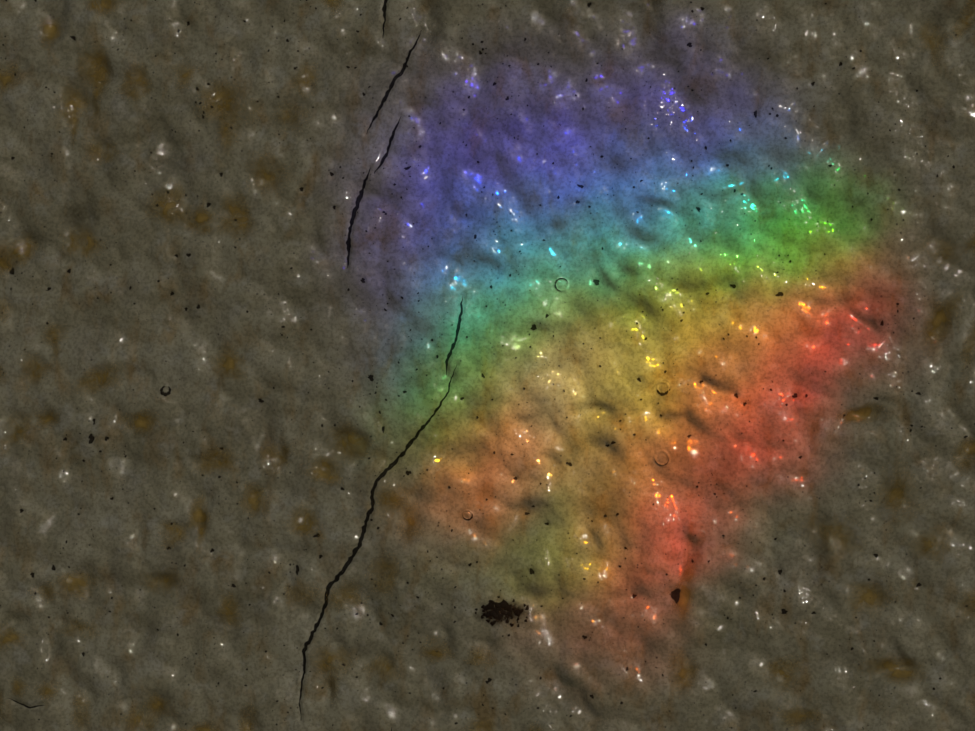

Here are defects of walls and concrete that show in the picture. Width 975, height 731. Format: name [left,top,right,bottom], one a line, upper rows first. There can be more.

crack [381,0,389,36]
crack [346,30,422,268]
crack [299,297,463,713]